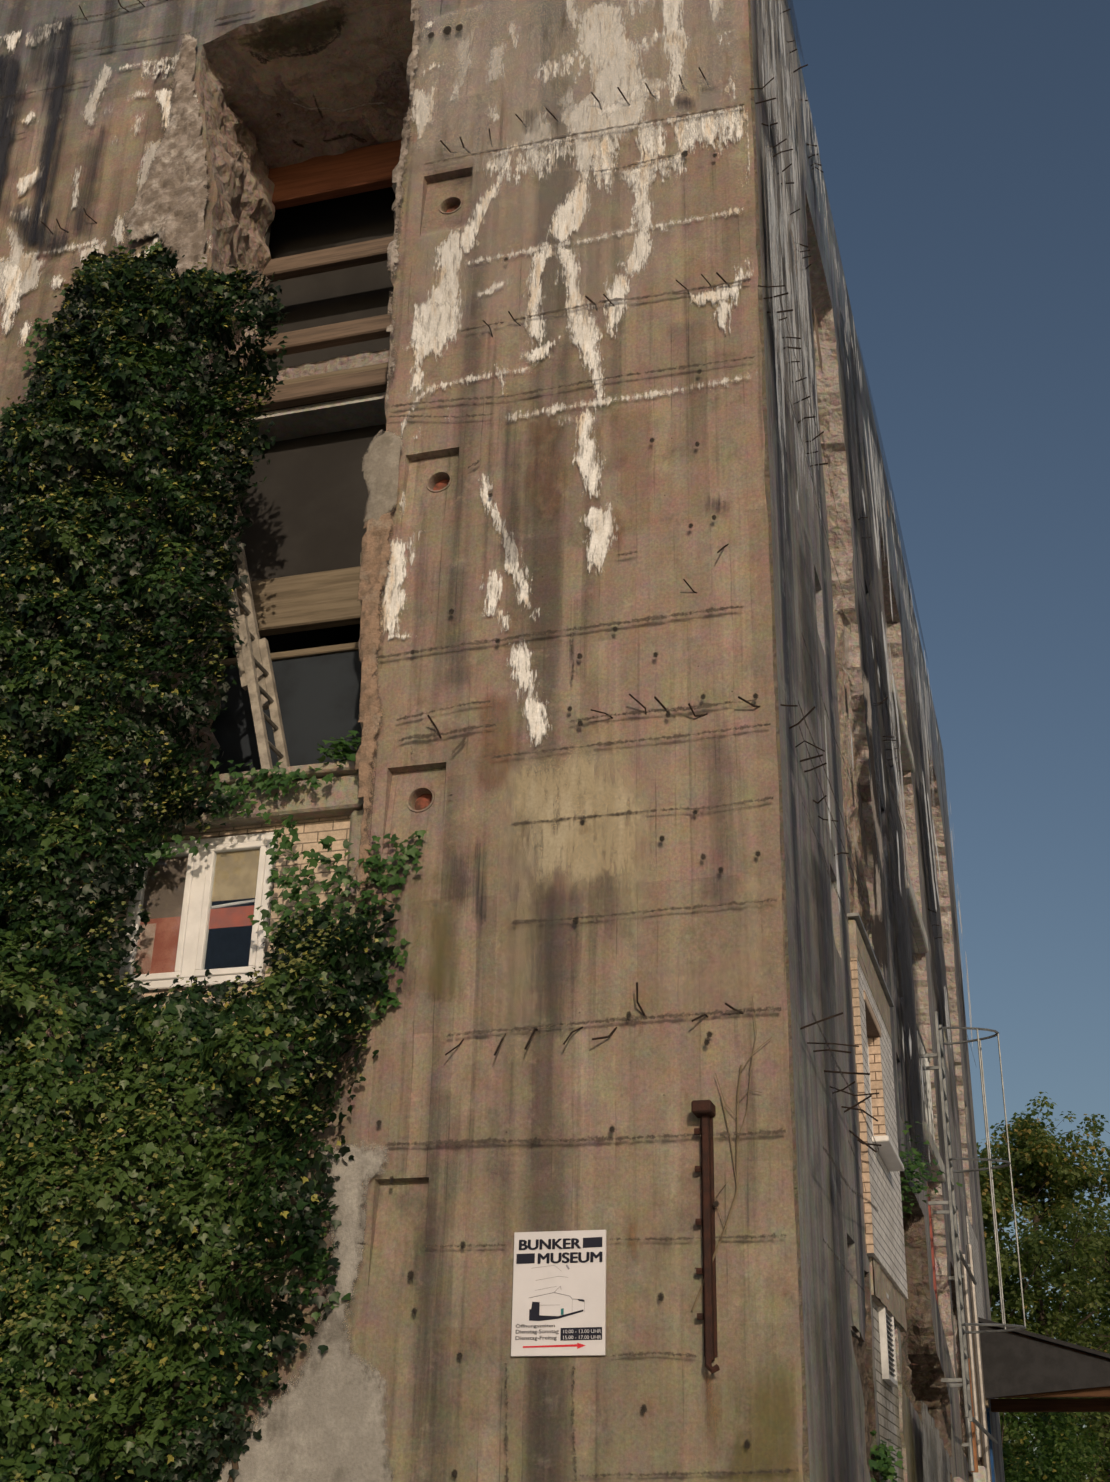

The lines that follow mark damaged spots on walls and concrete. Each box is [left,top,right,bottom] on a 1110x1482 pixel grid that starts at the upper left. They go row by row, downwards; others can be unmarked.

spalling [123,34,210,277]
spalling [375,0,462,437]
spalling [629,694,670,718]
leakage [401,0,973,1185]
spalling [738,0,898,1482]
leakage [804,531,857,1482]